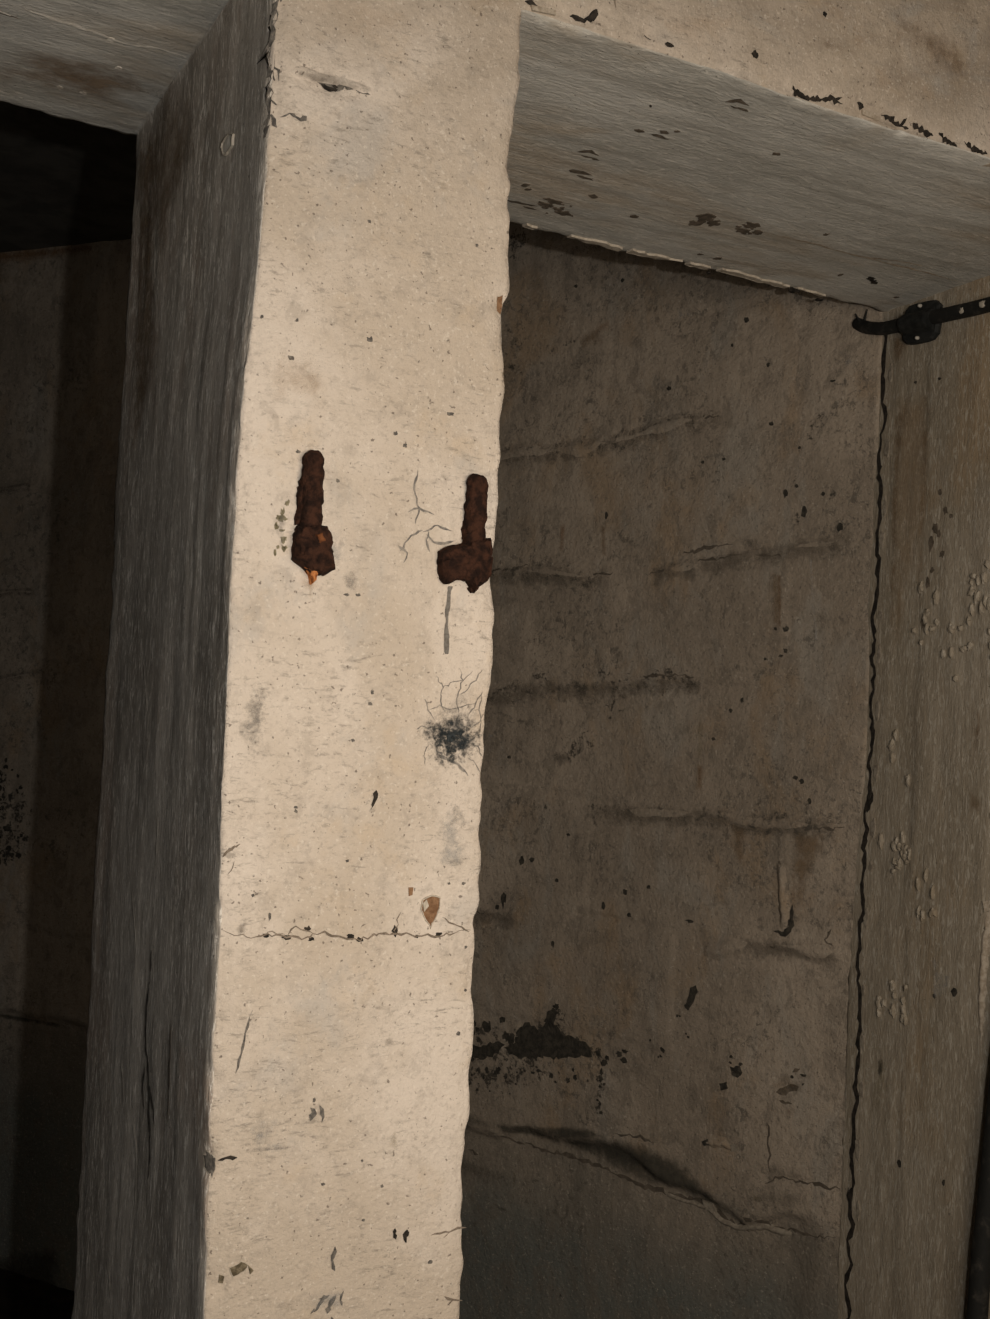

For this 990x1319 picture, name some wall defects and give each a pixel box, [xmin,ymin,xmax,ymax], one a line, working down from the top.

corrosion [294,478,303,525]
crack [468,335,893,1319]
crack [221,913,469,942]